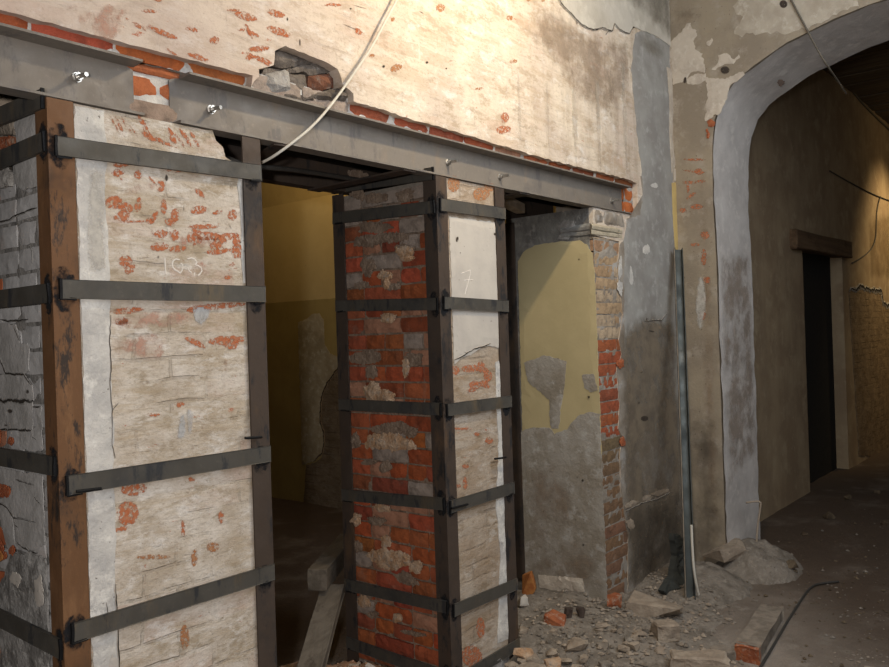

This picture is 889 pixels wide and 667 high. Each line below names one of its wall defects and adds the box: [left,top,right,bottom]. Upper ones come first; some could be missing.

flaking render [0,8,633,215]
crack [559,0,634,34]
peeling [667,23,745,250]
peeling [298,313,338,465]
peeling [521,237,669,600]